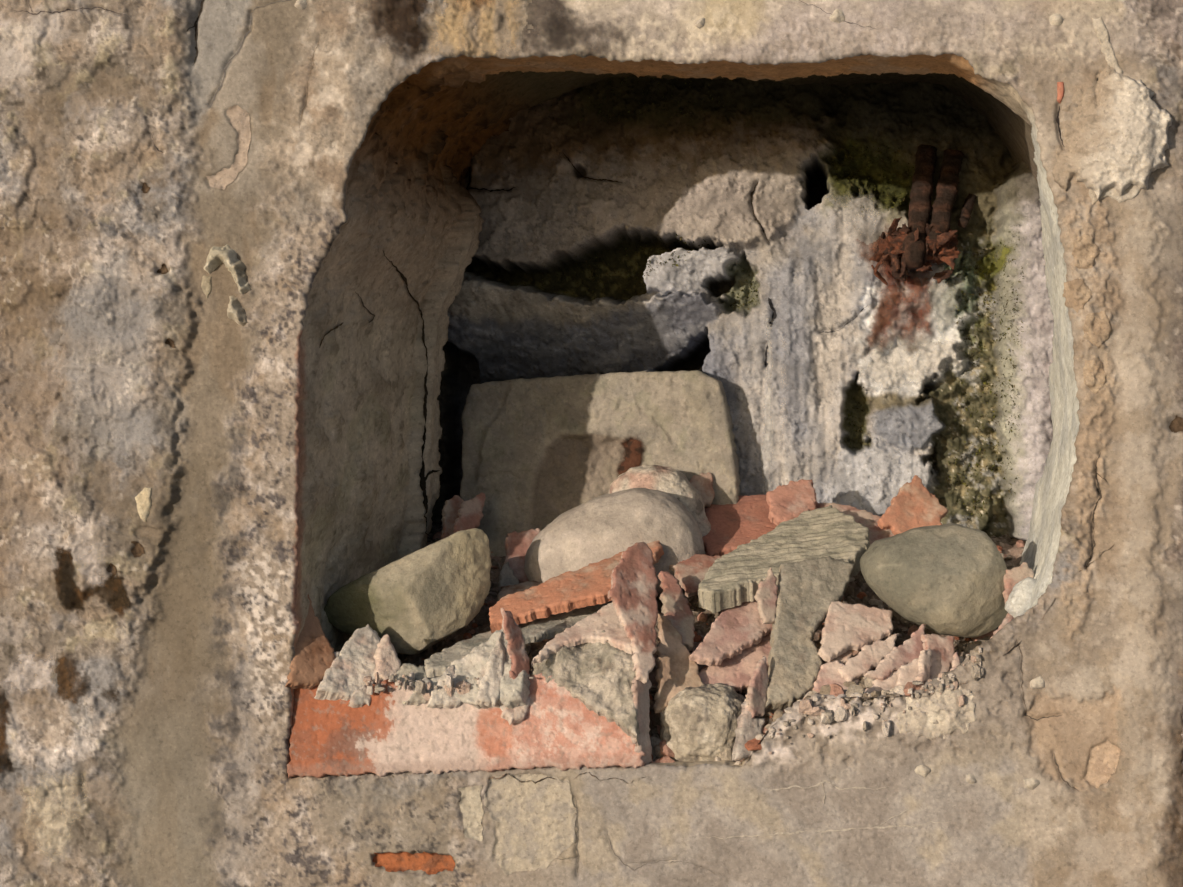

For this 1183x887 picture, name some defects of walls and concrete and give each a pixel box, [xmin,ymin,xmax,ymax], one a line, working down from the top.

crack [187,0,204,66]
crack [210,0,287,107]
rust [862,217,960,347]
crack [383,251,440,535]
peeling [441,492,486,540]
spalling [689,472,715,507]
peeling [990,562,1034,639]
peeling [812,624,961,694]